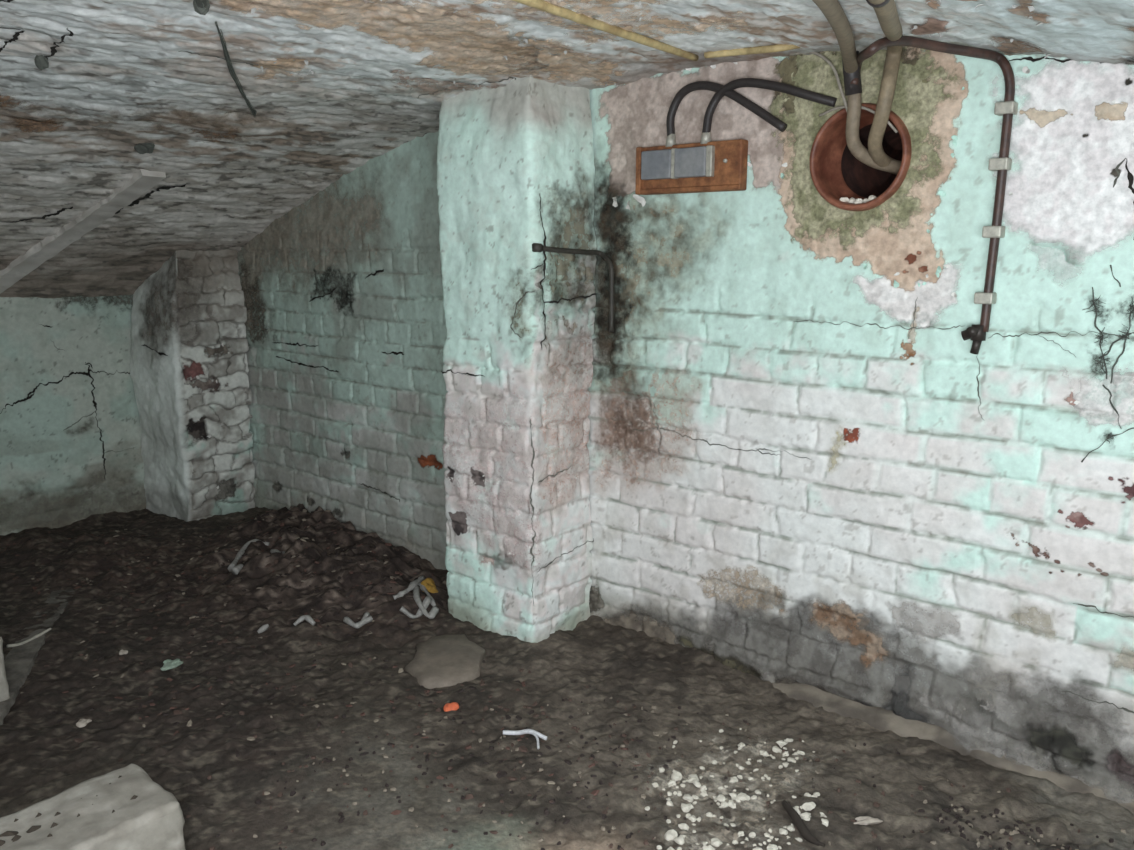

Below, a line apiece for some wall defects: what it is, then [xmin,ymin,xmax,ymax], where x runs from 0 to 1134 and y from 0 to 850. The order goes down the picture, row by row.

crack [0,0,24,52]
crack [1009,55,1071,63]
flaking render [221,0,968,329]
peeling [990,36,1134,281]
crack [1110,158,1134,204]
crack [0,324,135,479]
spalling [186,416,211,440]
spalling [182,343,233,393]
leakage [237,182,384,346]
leakage [511,176,648,459]
spalling [448,511,468,536]
leakage [602,566,1134,803]